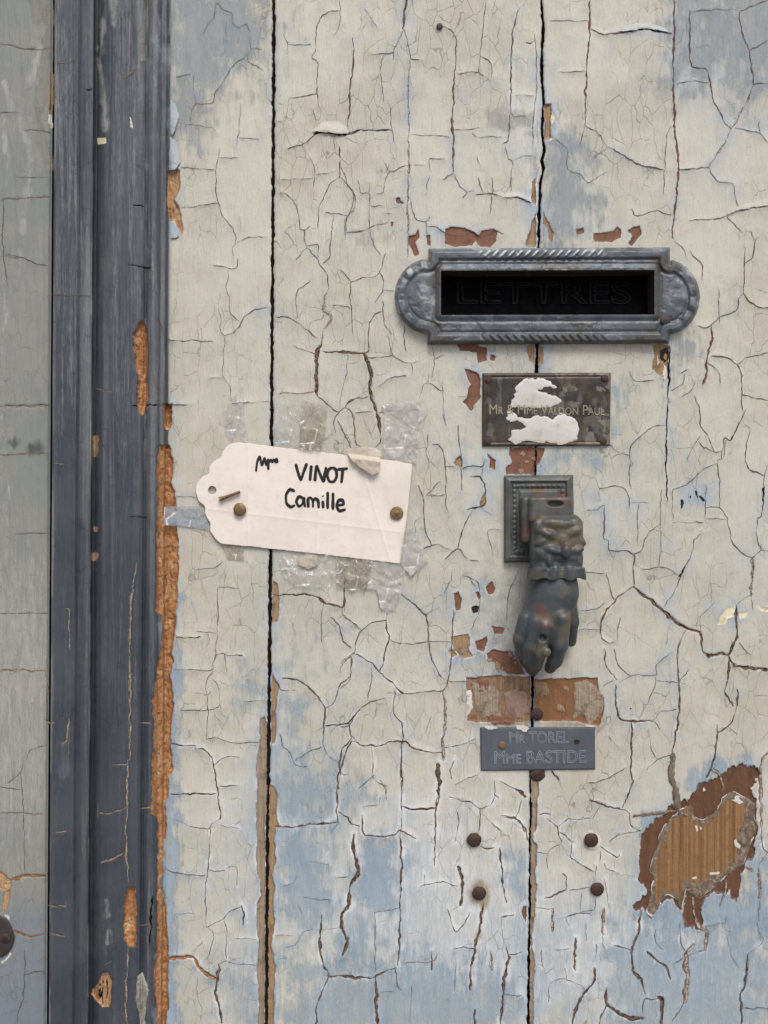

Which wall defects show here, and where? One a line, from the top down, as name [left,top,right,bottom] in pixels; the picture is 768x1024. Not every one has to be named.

peeling [408,230,431,256]
peeling [445,227,497,247]
peeling [576,226,642,246]
peeling [457,344,496,411]
spalling [652,344,669,380]
peeling [487,446,545,475]
crack [159,0,768,1024]
peeling [454,581,495,613]
peeling [448,625,525,675]
peeling [466,680,550,725]
peeling [557,679,604,724]
peeling [633,753,759,950]